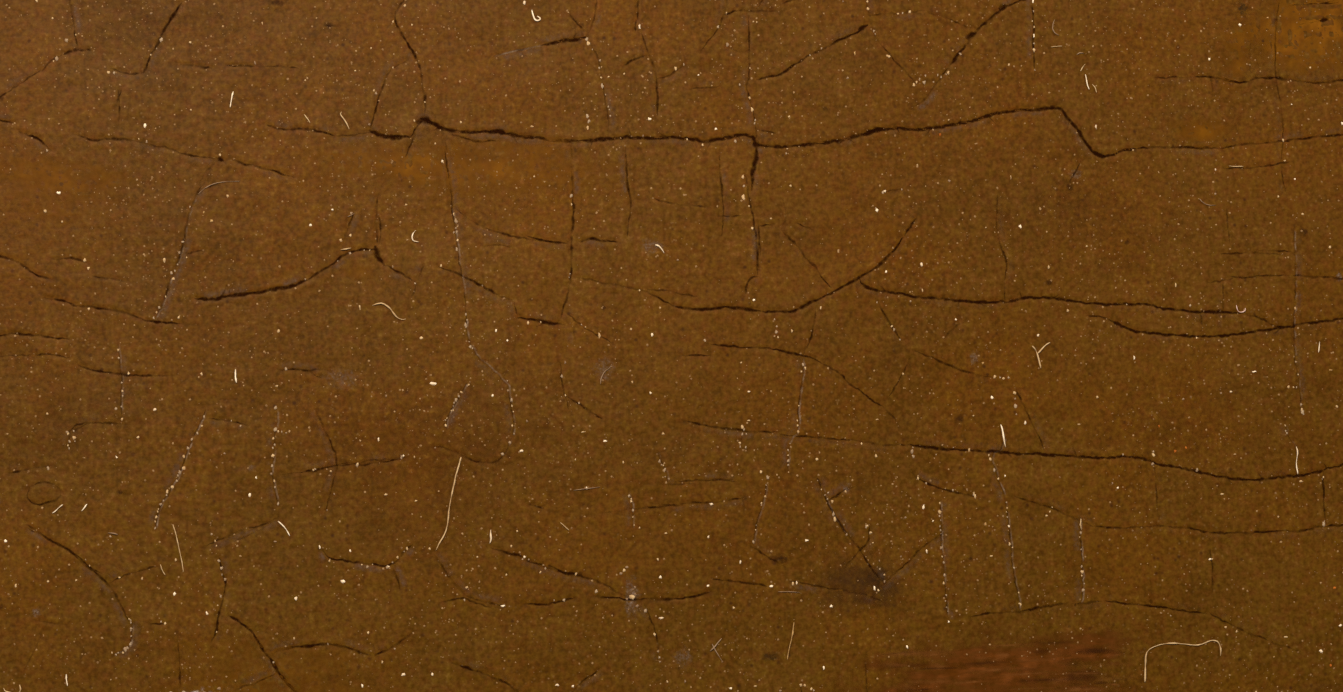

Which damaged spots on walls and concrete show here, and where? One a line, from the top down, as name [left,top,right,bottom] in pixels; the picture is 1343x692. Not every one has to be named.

crack [53,5,180,143]
crack [0,256,104,310]
crack [0,333,151,421]
crack [136,206,493,349]
crack [370,0,1343,663]
crack [15,423,166,656]
crack [154,412,242,529]
crack [262,406,290,525]
crack [306,441,402,472]
crack [211,533,409,686]